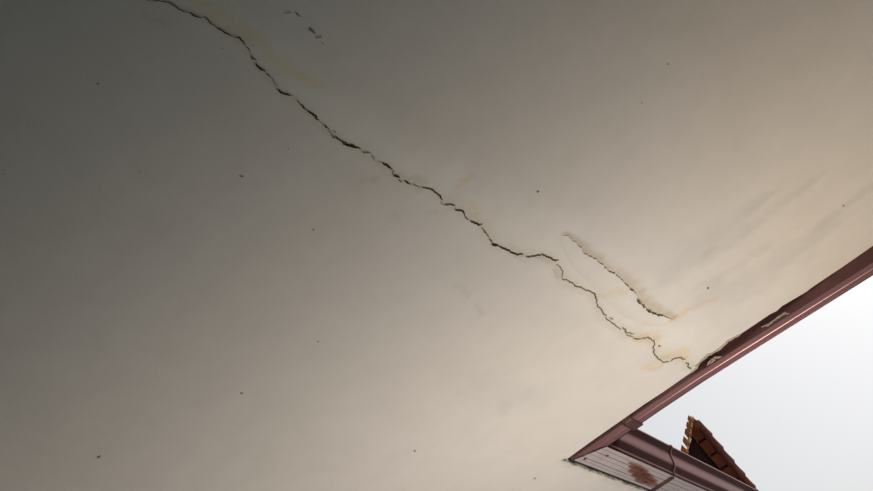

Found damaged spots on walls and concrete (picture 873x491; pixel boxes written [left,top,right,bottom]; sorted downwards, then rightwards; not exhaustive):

crack [153,0,697,369]